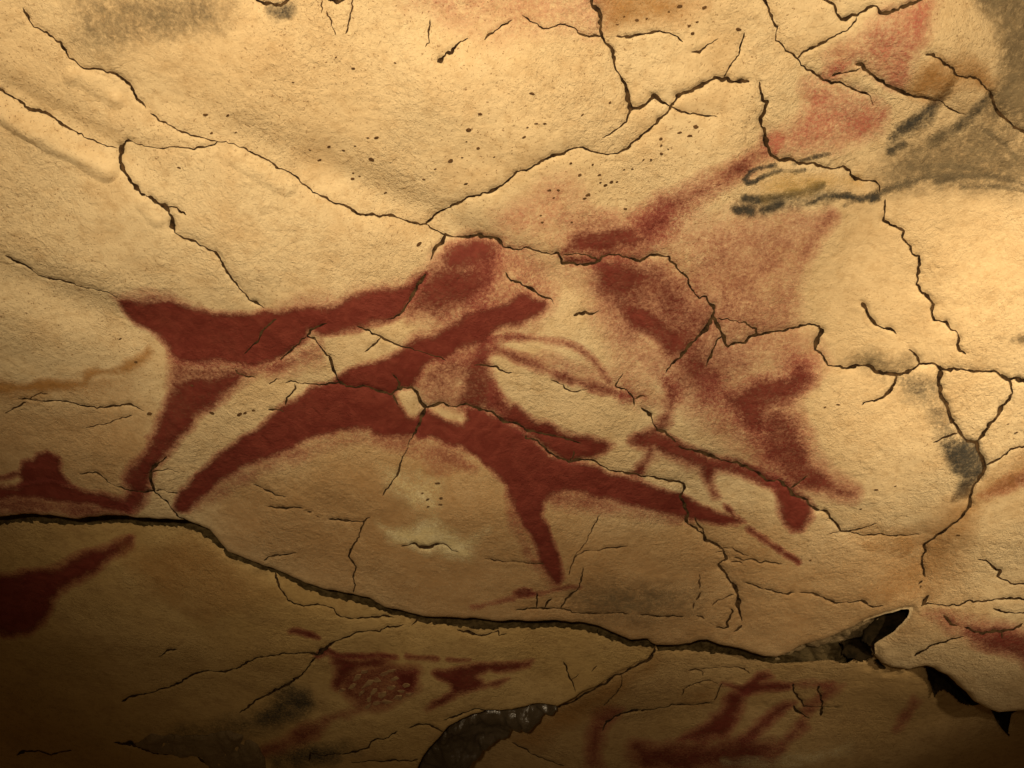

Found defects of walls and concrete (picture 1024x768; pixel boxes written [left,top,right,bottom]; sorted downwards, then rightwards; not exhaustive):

crack [0,0,1024,588]
crack [121,484,419,712]
crack [457,628,506,636]
spalling [842,609,909,669]
crack [915,595,1024,656]
crack [557,648,749,731]
spalling [927,668,973,706]